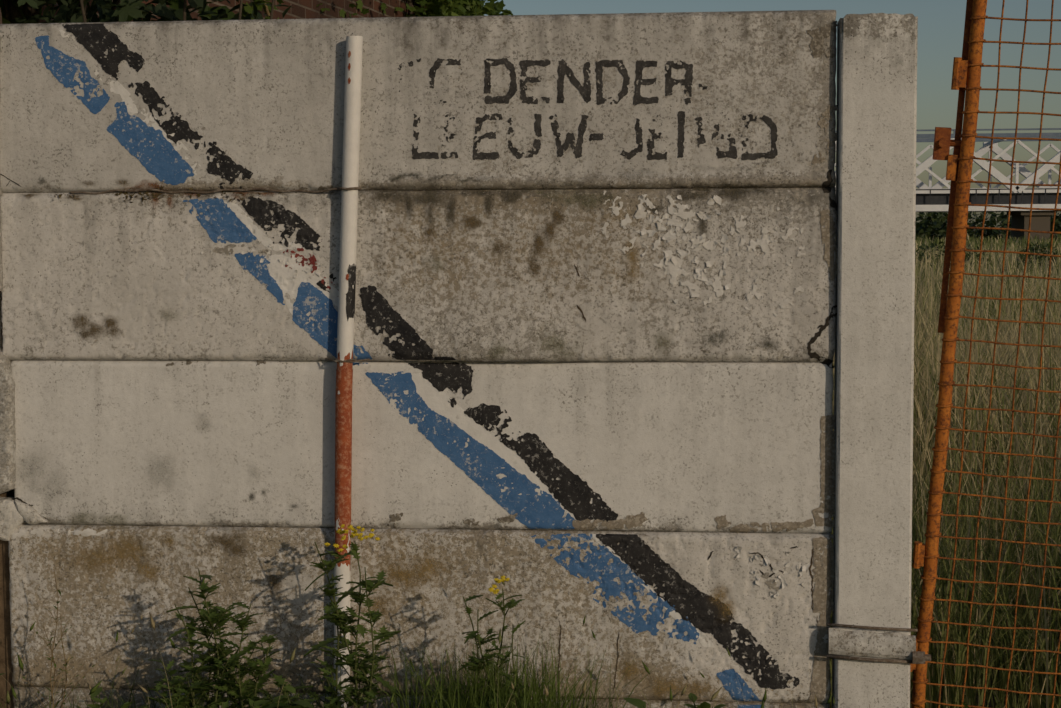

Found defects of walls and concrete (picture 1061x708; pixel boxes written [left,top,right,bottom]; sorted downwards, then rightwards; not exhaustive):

leakage [377,174,479,236]
leakage [460,177,525,211]
spalling [812,104,839,281]
leakage [530,210,563,273]
peeling [600,190,806,305]
leakage [75,316,118,338]
crack [807,305,837,368]
corrosion [335,368,353,524]
spalling [0,497,108,541]
spalling [714,415,836,708]